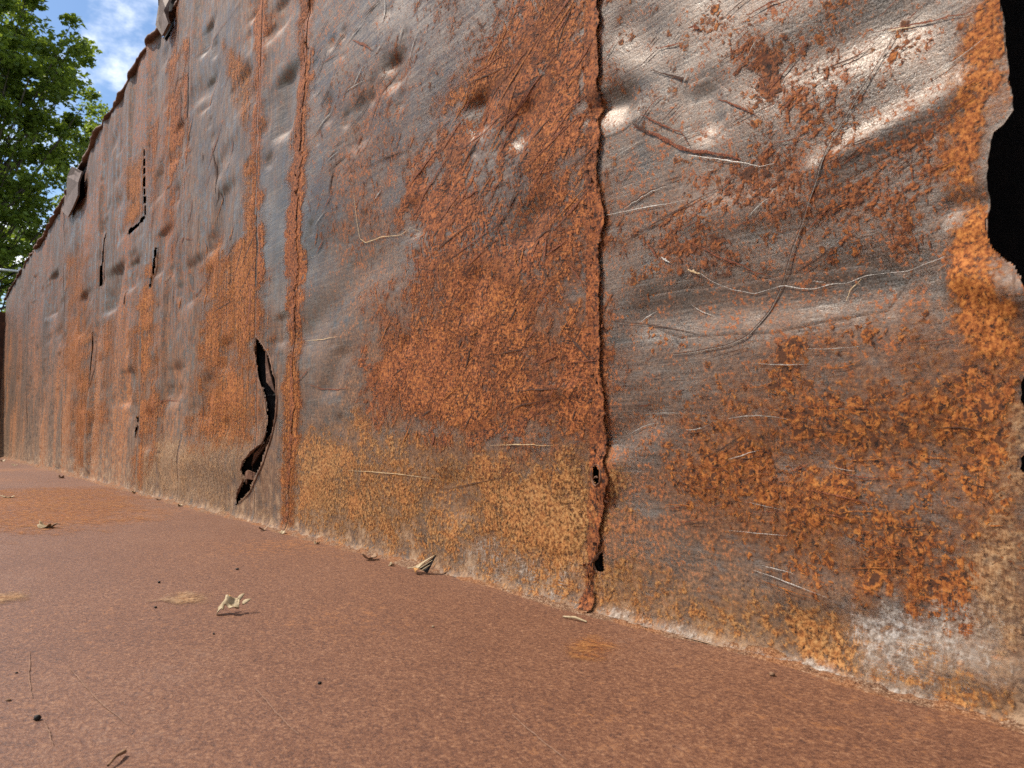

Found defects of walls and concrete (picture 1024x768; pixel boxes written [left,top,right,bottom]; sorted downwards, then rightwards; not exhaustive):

corrosion [58,239,116,471]
crack [132,146,143,232]
corrosion [124,0,276,514]
corrosion [279,0,1024,721]
water stain [852,600,991,698]